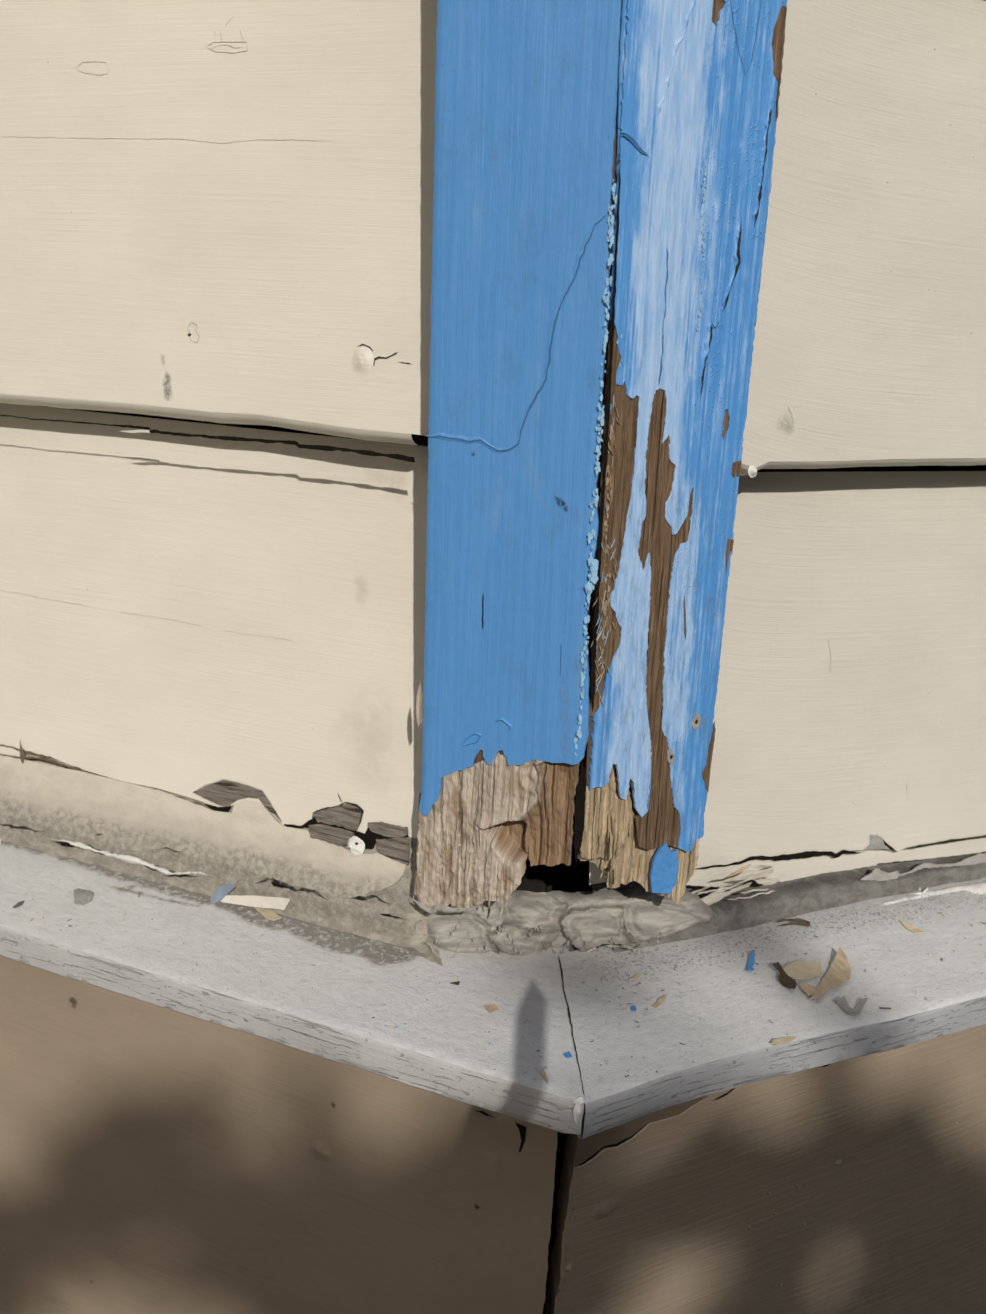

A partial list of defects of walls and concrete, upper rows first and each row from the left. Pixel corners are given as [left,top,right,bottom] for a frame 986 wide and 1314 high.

peeling [731,460,742,477]
peeling [589,319,696,850]
peeling [726,539,734,570]
peeling [691,712,716,792]